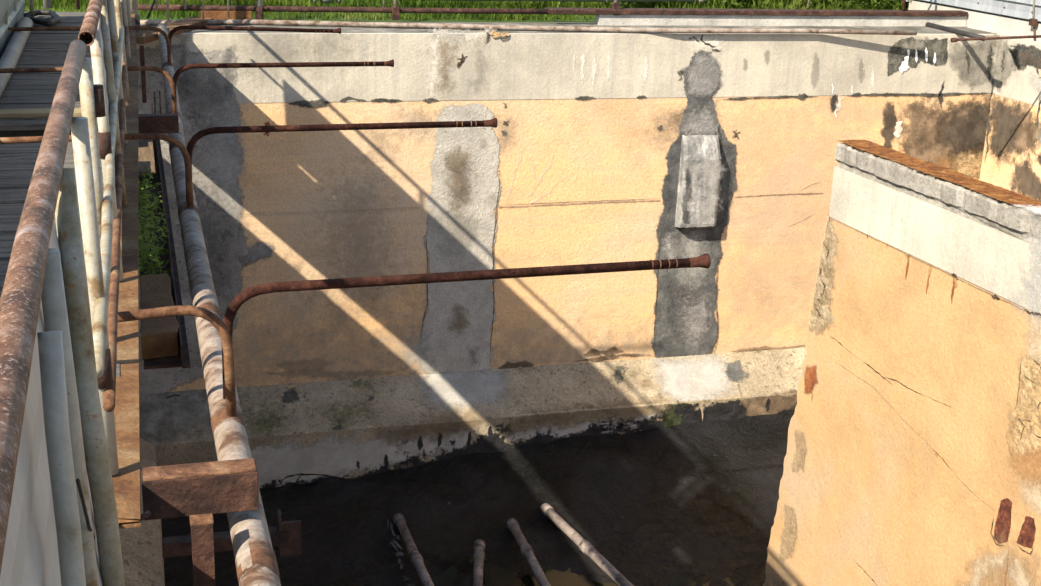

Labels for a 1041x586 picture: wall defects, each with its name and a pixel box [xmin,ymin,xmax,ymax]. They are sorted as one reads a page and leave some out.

spalling [887,37,948,76]
peeling [1009,43,1041,78]
damp [847,36,1041,213]
peeling [809,218,838,334]
crack [734,182,1041,318]
damp [251,390,797,488]
corrosion [805,366,818,401]
crack [830,336,994,510]
spalling [1008,309,1041,481]